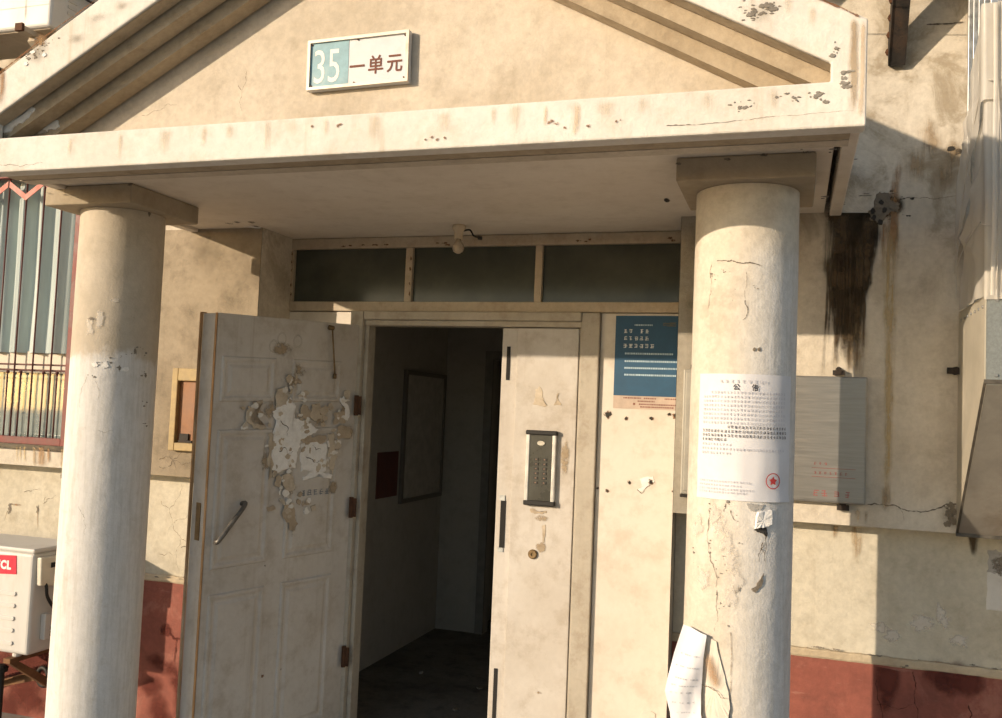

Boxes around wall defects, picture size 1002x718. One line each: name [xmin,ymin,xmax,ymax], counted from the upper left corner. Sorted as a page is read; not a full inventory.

peeling [738,0,781,21]
peeling [24,37,60,66]
peeling [775,91,830,104]
spalling [860,190,914,225]
corrosion [882,172,898,331]
crack [709,260,760,320]
leakage [825,213,879,364]
crack [868,503,956,520]
spalling [987,549,1002,576]
leakage [877,667,898,709]
leakage [925,670,982,695]